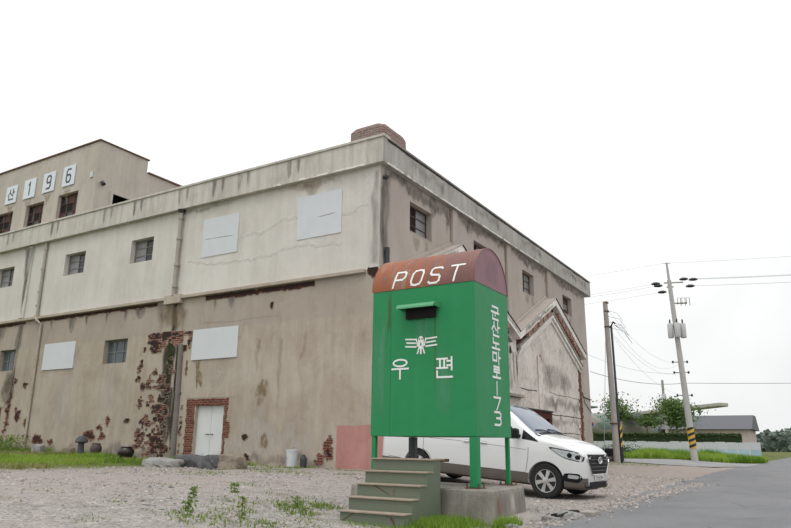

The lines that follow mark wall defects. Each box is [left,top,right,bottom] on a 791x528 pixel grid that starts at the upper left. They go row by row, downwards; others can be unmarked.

flaking render [1,378,53,446]
flaking render [82,415,111,442]
flaking render [123,330,202,457]